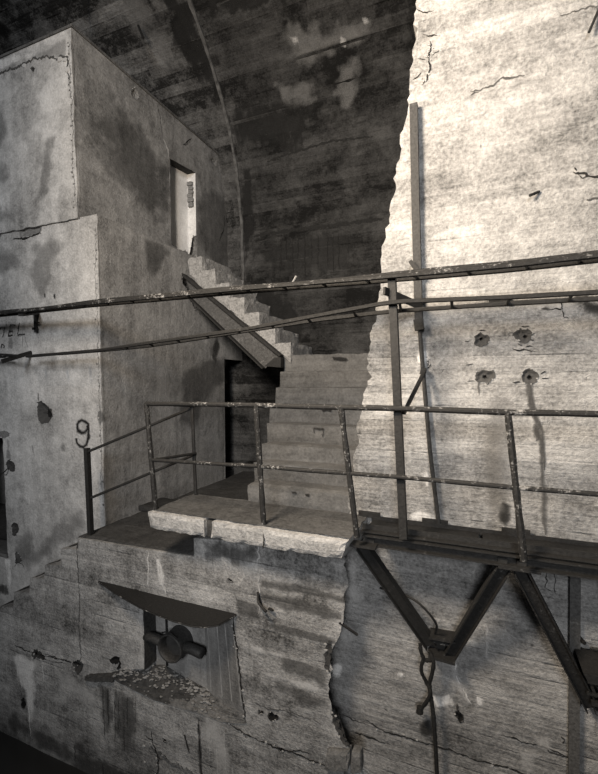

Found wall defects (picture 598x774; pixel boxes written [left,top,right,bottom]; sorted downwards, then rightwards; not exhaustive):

crack [414,34,438,85]
crack [470,75,524,95]
spalling [465,330,490,347]
spalling [512,326,537,347]
spalling [467,364,495,392]
spalling [513,368,548,385]
spalling [37,401,54,425]
crack [228,618,325,766]
damp [9,655,122,774]
crack [146,733,161,774]
crack [344,715,523,774]
crack [503,735,568,758]